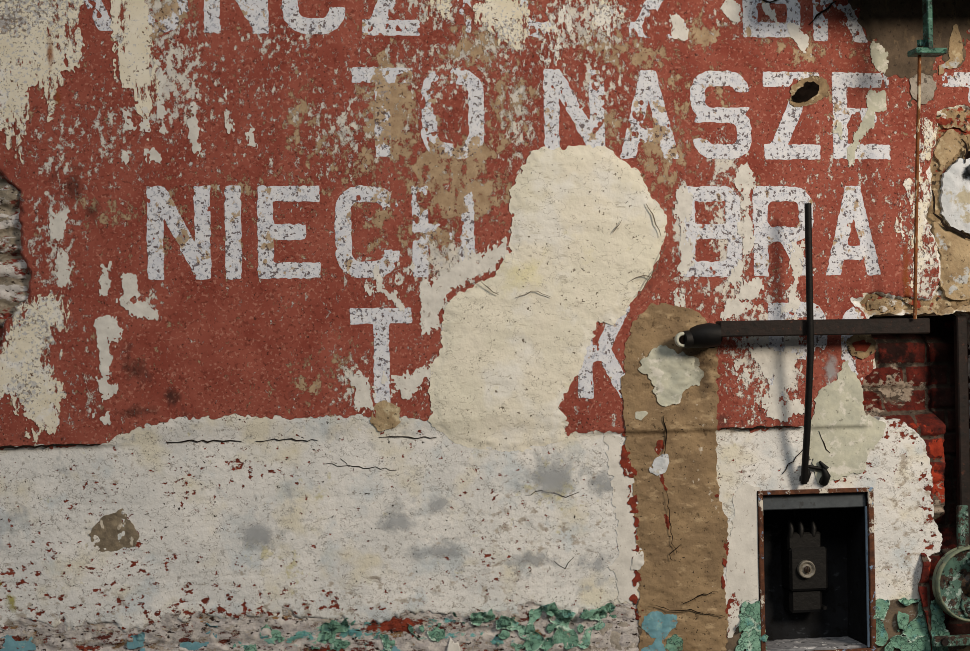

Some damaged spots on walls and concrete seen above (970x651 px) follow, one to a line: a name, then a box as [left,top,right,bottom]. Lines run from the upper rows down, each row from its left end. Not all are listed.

peeling [0,0,85,163]
peeling [109,0,168,164]
peeling [471,0,629,68]
flaking render [848,0,970,107]
peeling [0,173,74,446]
peeling [92,261,159,425]
crack [166,436,318,444]
flaking render [0,432,644,651]
crack [326,458,397,471]
peeling [340,361,433,432]
peeling [364,236,509,337]
flaking render [860,107,970,314]